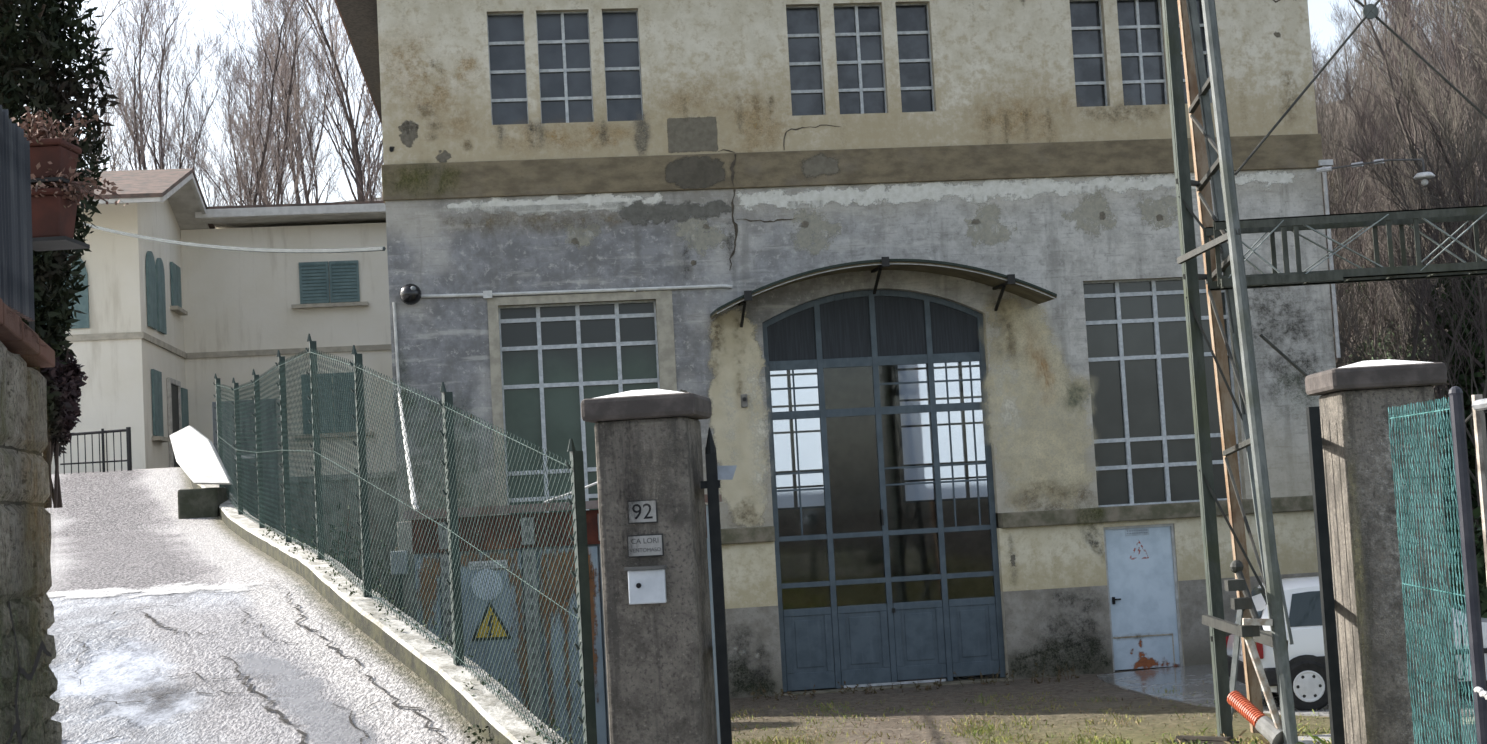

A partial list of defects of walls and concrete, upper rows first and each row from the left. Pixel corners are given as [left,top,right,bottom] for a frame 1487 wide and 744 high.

spalling [398,109,471,163]
crack [783,125,839,150]
crack [718,149,795,269]
peeling [447,156,1296,231]
corrosion [416,557,441,628]
corrosion [460,547,600,743]
corrosion [1130,635,1178,670]